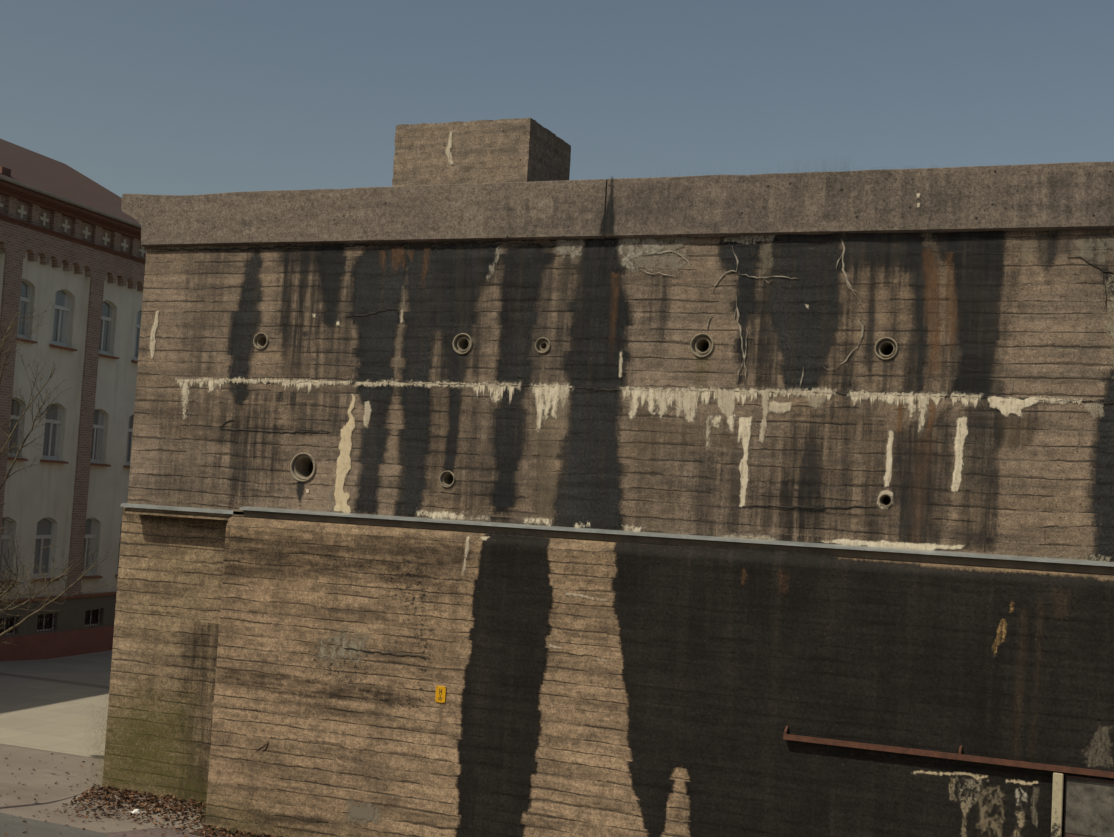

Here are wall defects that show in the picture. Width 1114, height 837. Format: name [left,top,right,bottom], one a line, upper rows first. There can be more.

crack [154,239,577,251]
crack [176,241,1114,404]
water stain [177,178,1114,837]
peeling [949,778,1039,837]